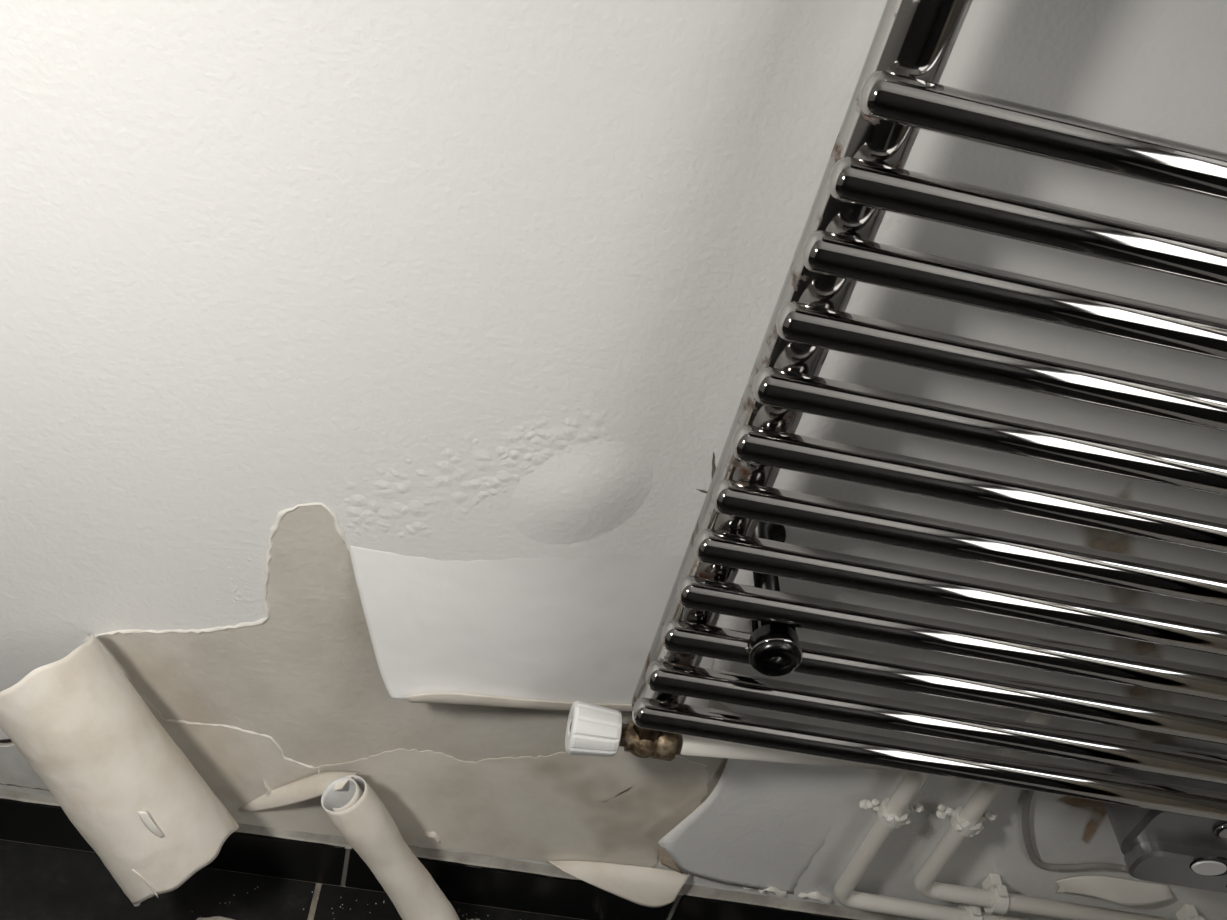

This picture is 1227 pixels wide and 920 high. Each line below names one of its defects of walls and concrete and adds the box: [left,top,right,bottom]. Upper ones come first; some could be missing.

peeling [0,503,838,920]